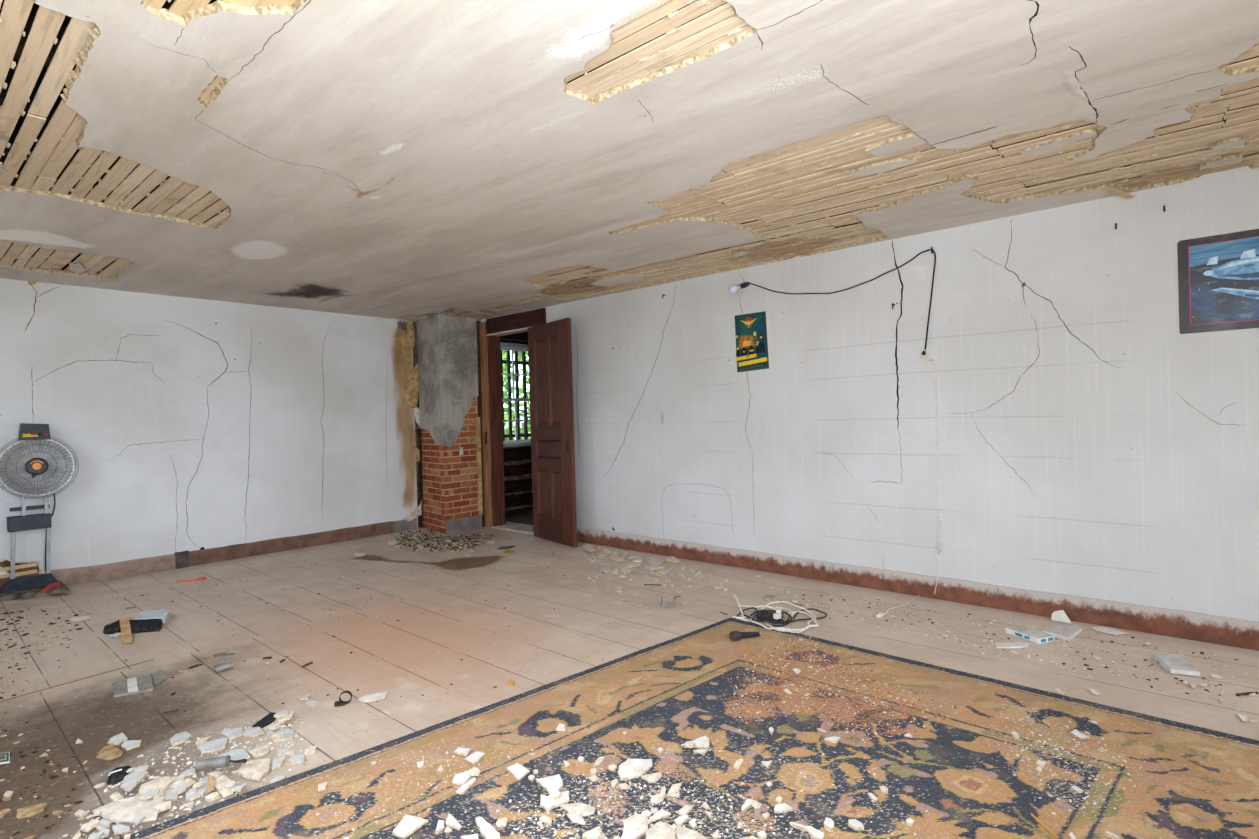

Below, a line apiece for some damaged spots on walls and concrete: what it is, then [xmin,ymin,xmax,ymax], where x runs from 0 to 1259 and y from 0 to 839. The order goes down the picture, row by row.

flaking render [0,240,136,286]
flaking render [0,0,232,229]
crack [31,319,252,554]
flaking render [139,0,306,27]
crack [386,330,423,527]
peeling [396,307,471,426]
flaking render [563,0,758,104]
crack [819,241,903,483]
flaking render [492,42,1259,311]
crack [1020,0,1039,66]
crack [948,219,1120,498]
crack [1069,46,1226,125]